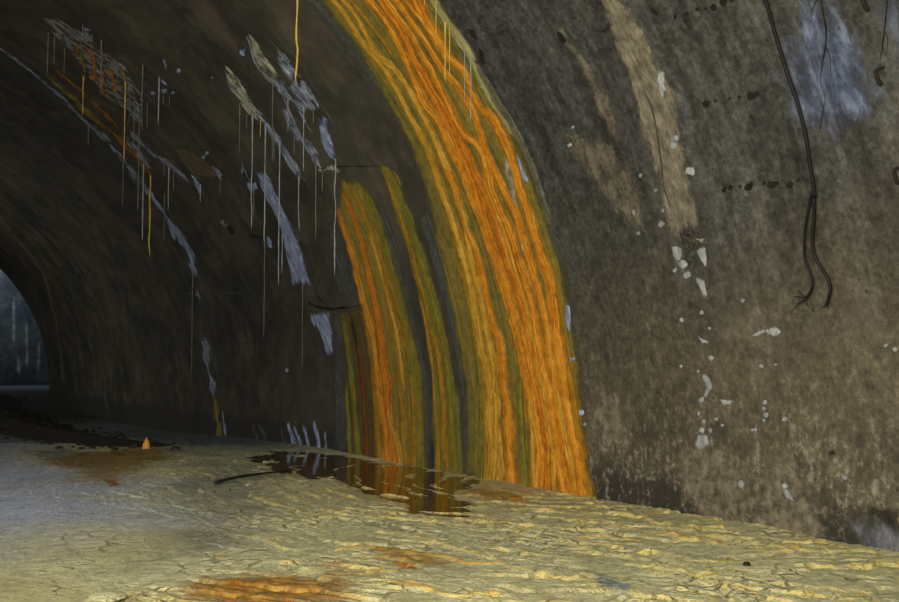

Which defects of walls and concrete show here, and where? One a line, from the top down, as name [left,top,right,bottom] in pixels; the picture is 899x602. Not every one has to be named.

rust [75,40,127,96]
water stain [0,15,236,436]
water stain [225,35,354,450]
rust [323,0,594,501]
water stain [559,27,643,226]
crack [810,0,835,132]
water stain [789,7,877,124]